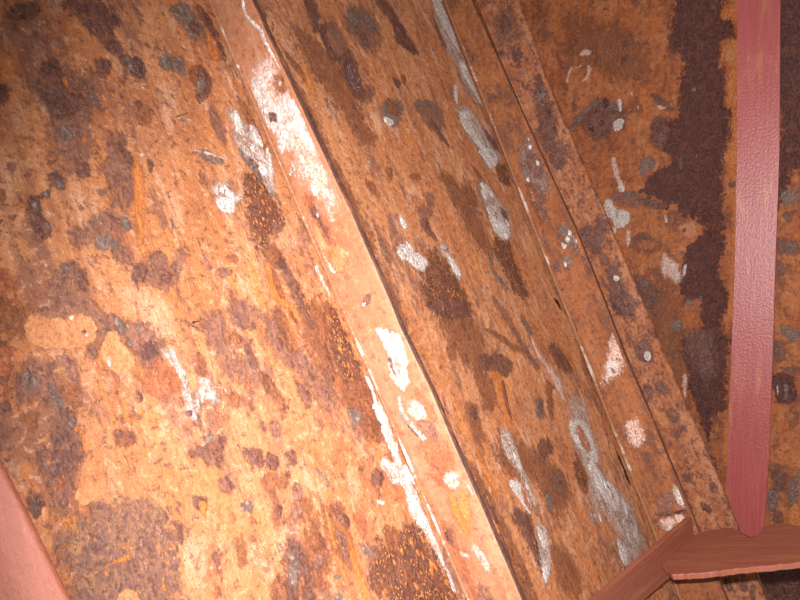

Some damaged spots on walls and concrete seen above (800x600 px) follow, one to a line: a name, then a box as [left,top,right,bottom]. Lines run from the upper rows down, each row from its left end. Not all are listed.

rust [26,0,186,302]
rust [188,65,227,145]
rust [197,4,226,61]
leakage [226,0,339,217]
rust [0,259,193,600]
rust [187,434,257,569]
rust [199,168,389,443]
leakage [364,371,459,593]
rust [242,0,589,600]
leakage [541,359,646,568]
rust [472,0,742,534]
leakage [600,333,627,386]